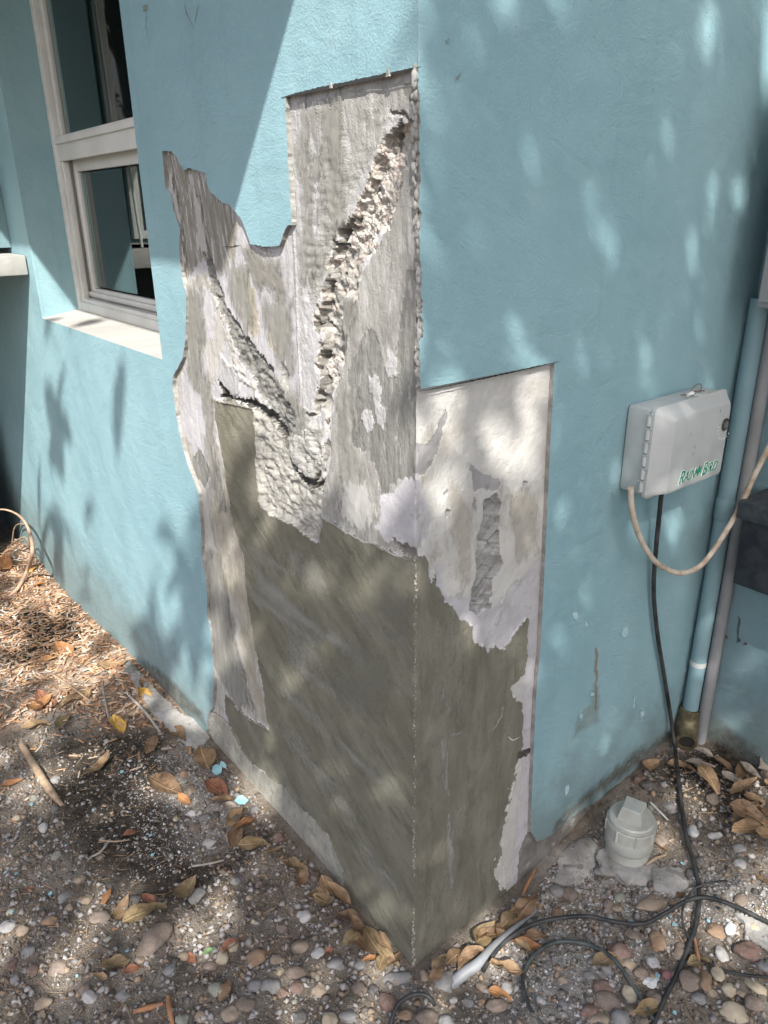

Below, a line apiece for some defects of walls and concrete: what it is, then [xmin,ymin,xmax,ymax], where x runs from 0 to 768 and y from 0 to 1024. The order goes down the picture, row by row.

peeling [166,62,550,892]